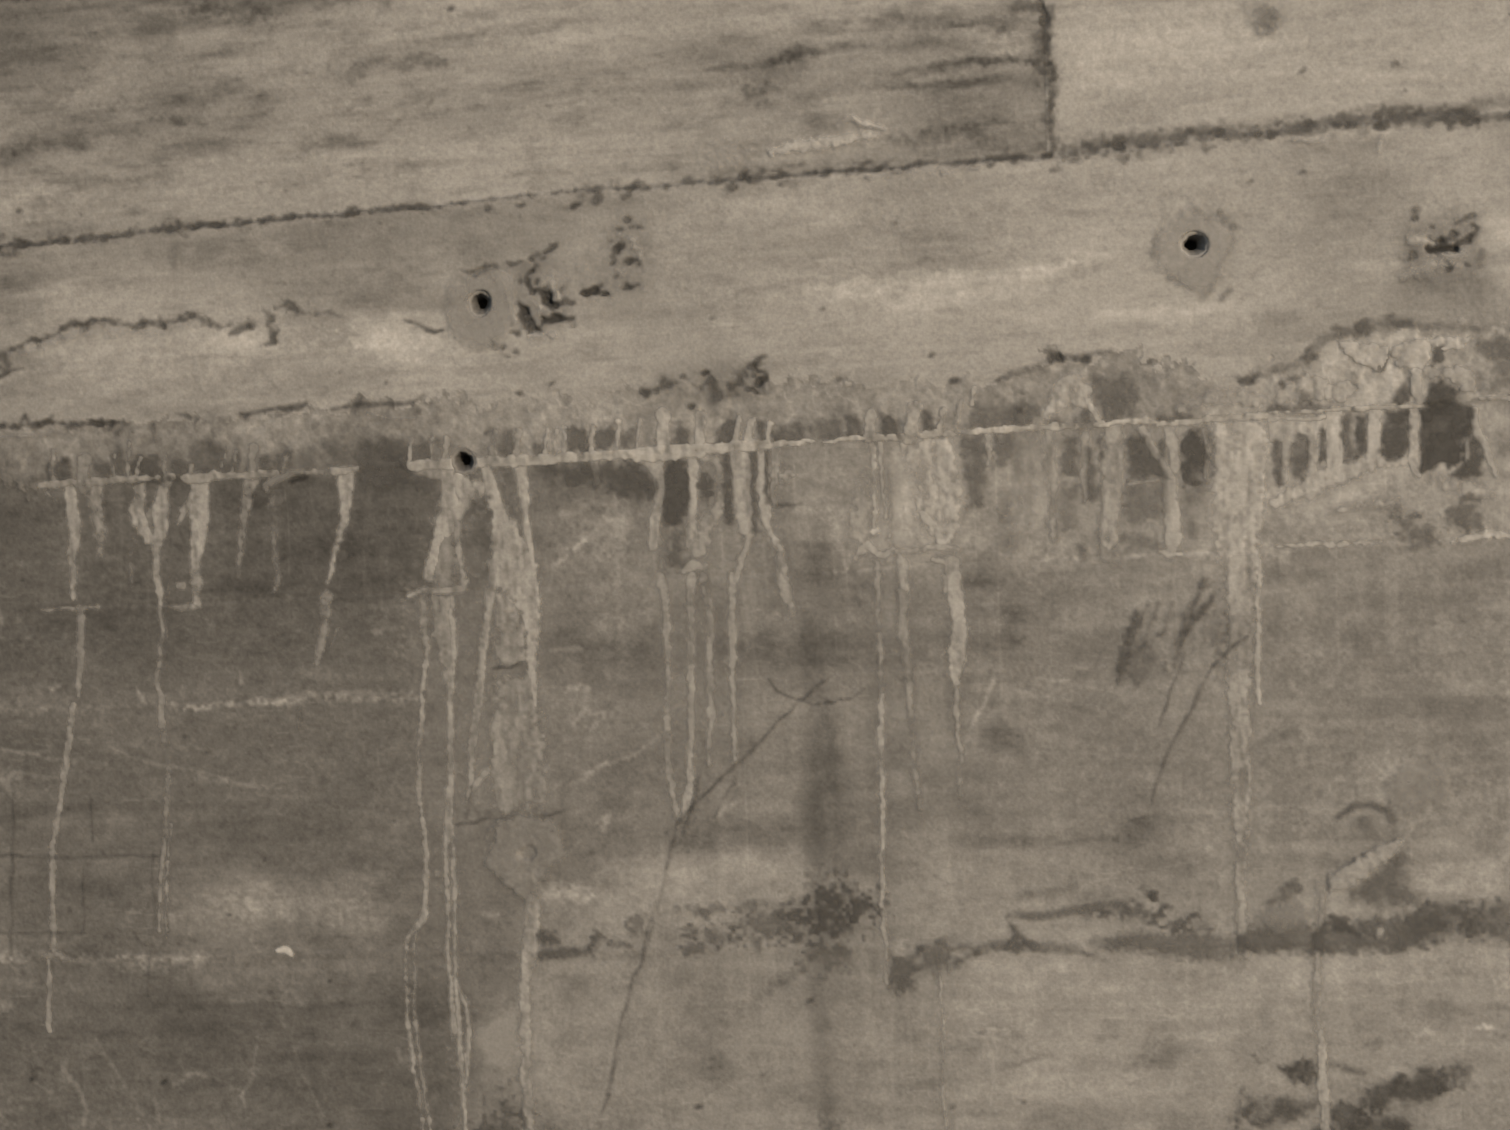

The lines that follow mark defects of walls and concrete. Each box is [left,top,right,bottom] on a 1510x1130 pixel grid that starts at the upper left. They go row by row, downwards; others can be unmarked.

spalling [466,216,641,354]
spalling [1408,209,1478,277]
water stain [38,336,1510,1130]